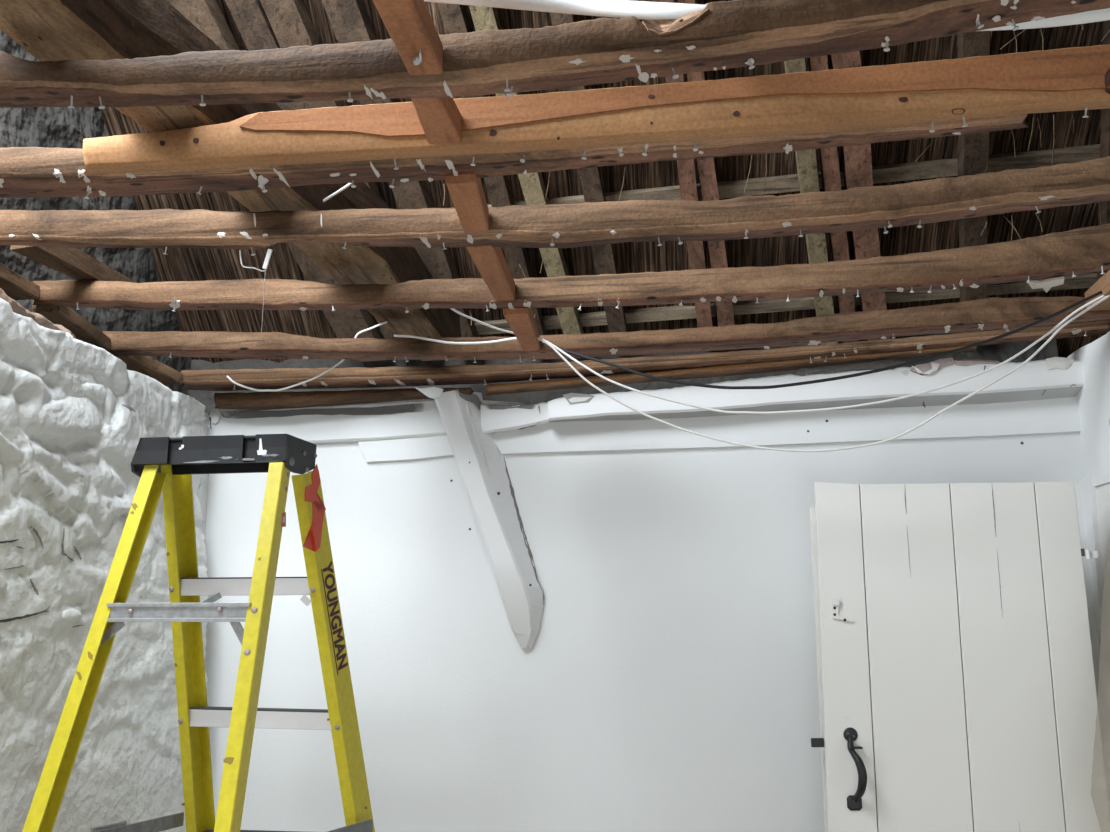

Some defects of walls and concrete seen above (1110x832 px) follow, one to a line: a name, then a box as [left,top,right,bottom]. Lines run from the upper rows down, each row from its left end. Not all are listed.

crack [0,526,82,623]